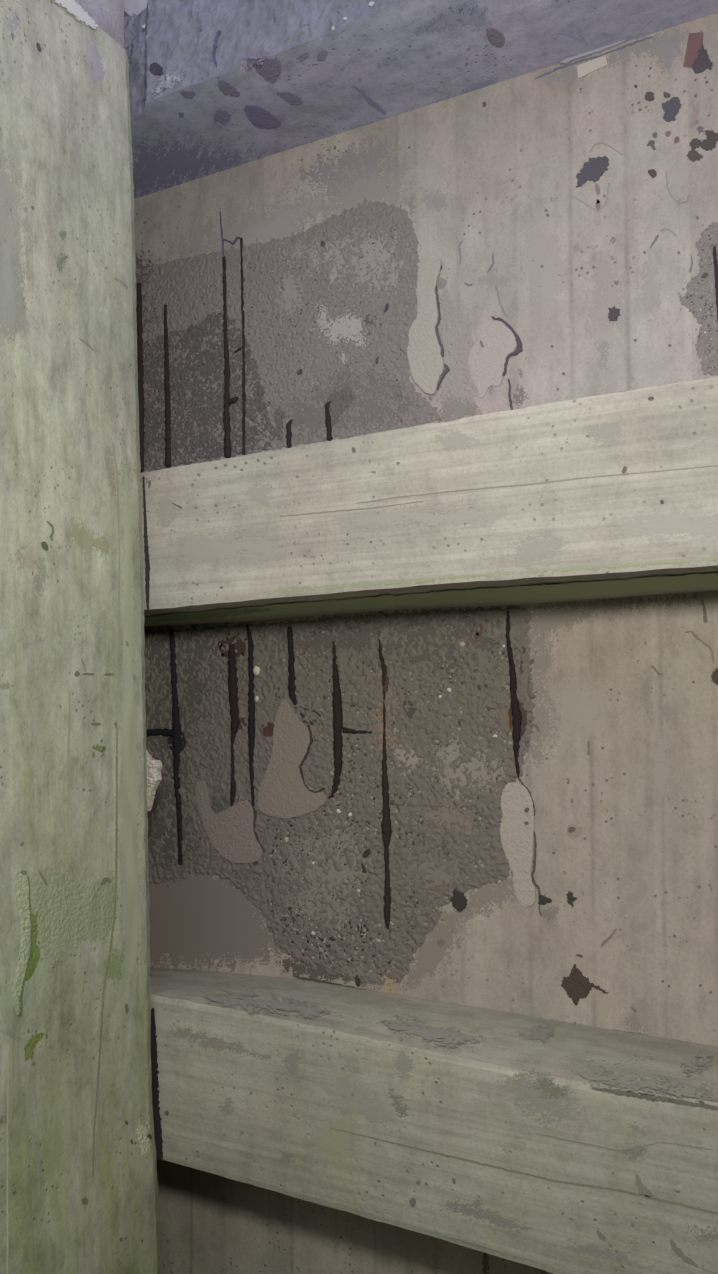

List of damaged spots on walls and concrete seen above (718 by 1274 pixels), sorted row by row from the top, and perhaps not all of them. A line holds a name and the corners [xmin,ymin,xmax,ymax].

spalling [135,198,517,486]
crack [435,241,523,410]
spalling [679,216,718,376]
spalling [133,605,537,991]
crack [592,1087,718,1111]